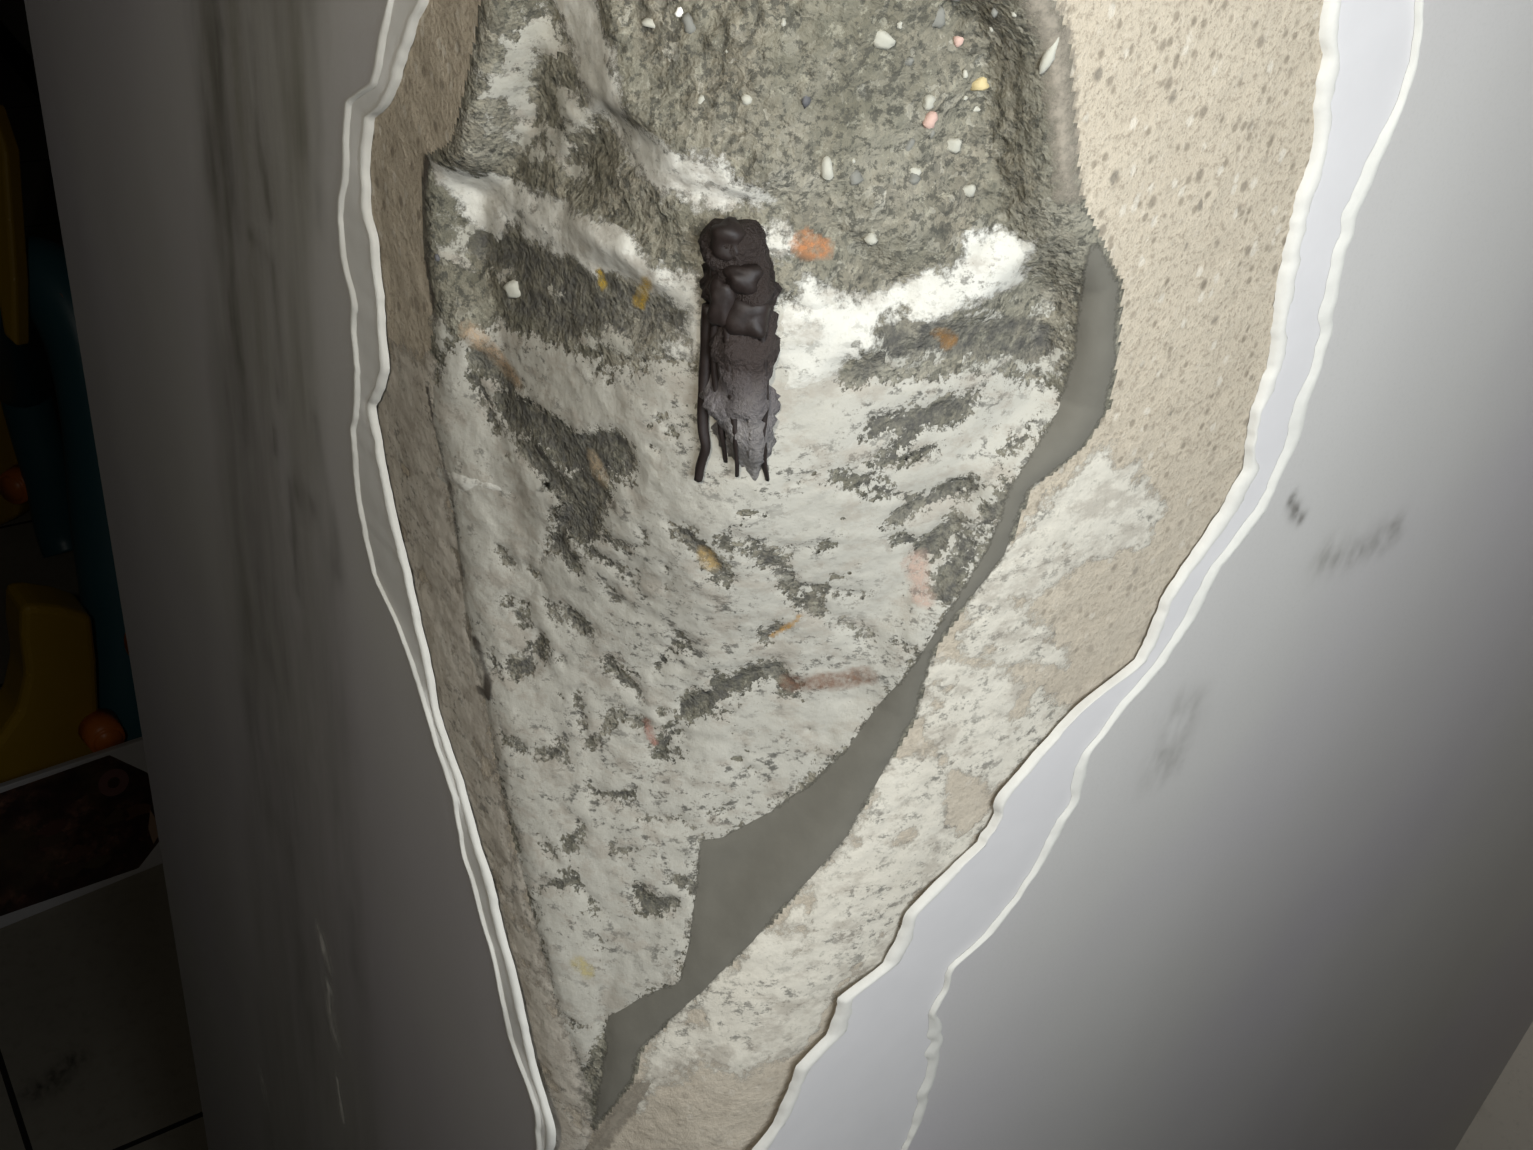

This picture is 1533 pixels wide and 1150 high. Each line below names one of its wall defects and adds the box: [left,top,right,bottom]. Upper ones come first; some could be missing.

spalling [337,0,1424,1150]